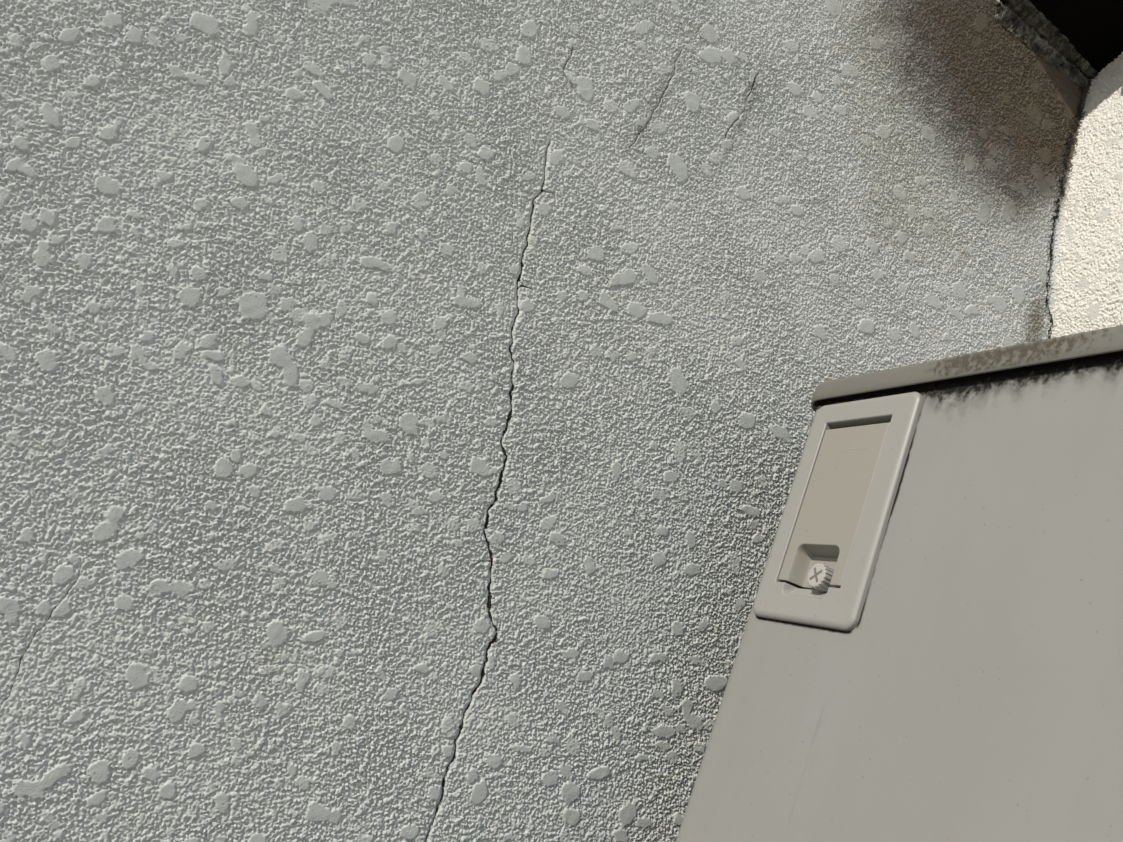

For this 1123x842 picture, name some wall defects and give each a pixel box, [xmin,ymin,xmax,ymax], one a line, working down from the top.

water stain [901,0,1093,200]
crack [411,142,554,842]